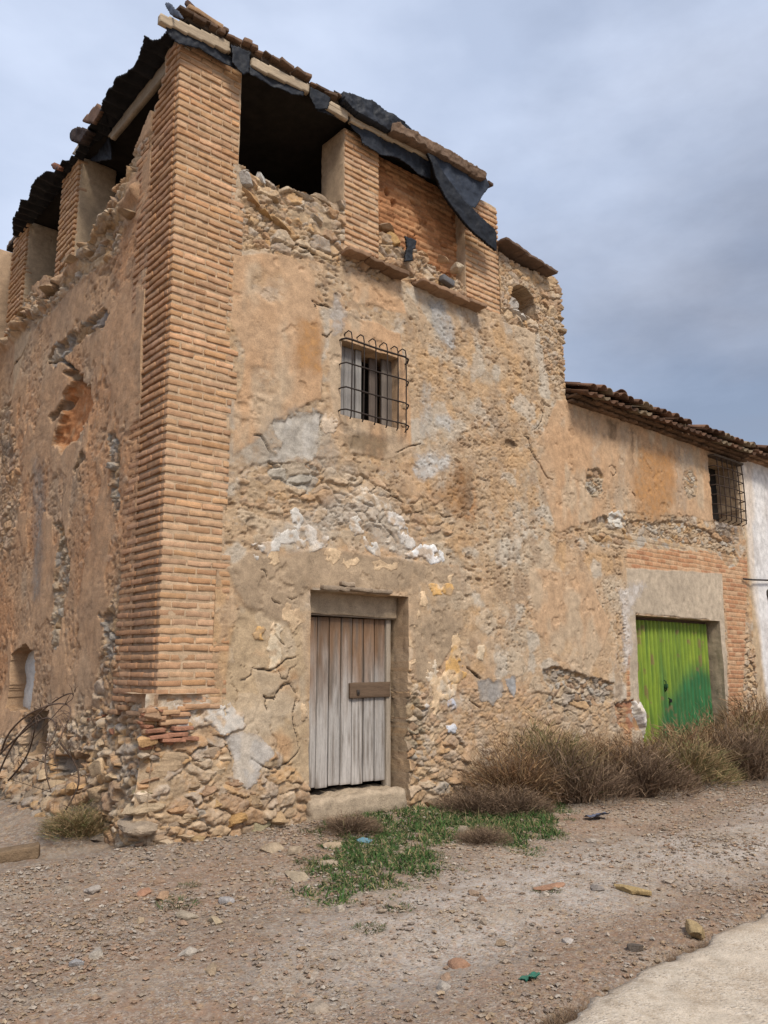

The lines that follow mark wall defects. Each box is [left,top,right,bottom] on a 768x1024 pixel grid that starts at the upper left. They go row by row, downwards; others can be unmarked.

spalling [50,399,75,422]
spalling [63,369,89,389]
flaking render [253,408,338,494]
flaking render [251,486,445,571]
flaking render [587,514,740,569]
flaking render [168,702,275,790]
crack [240,642,300,770]
flaking render [404,573,516,795]
flaking render [542,666,639,731]